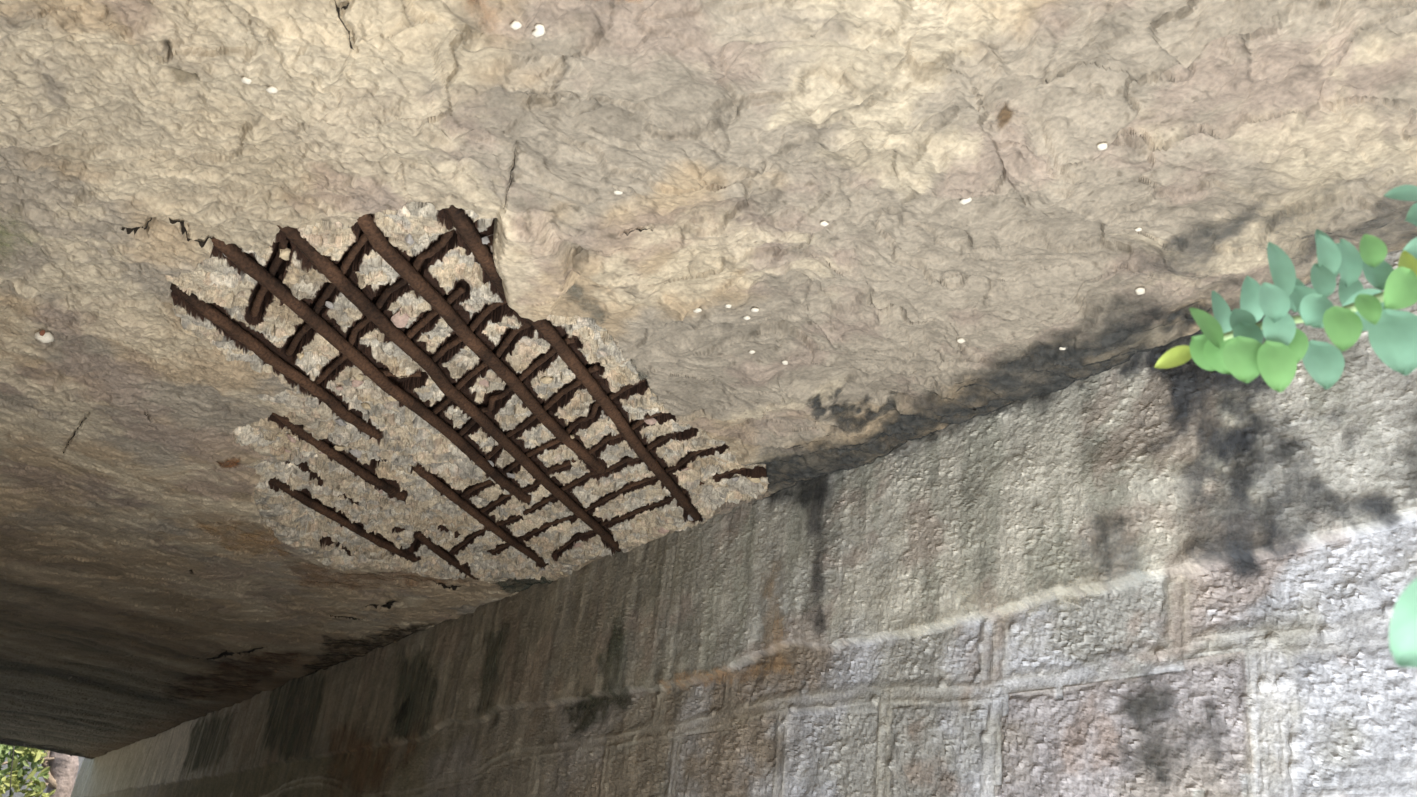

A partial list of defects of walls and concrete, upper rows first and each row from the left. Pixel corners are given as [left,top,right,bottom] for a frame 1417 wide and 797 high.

rust [218,459,240,468]
spalling [164,192,769,583]
damp [757,300,1399,632]
damp [1121,690,1173,784]